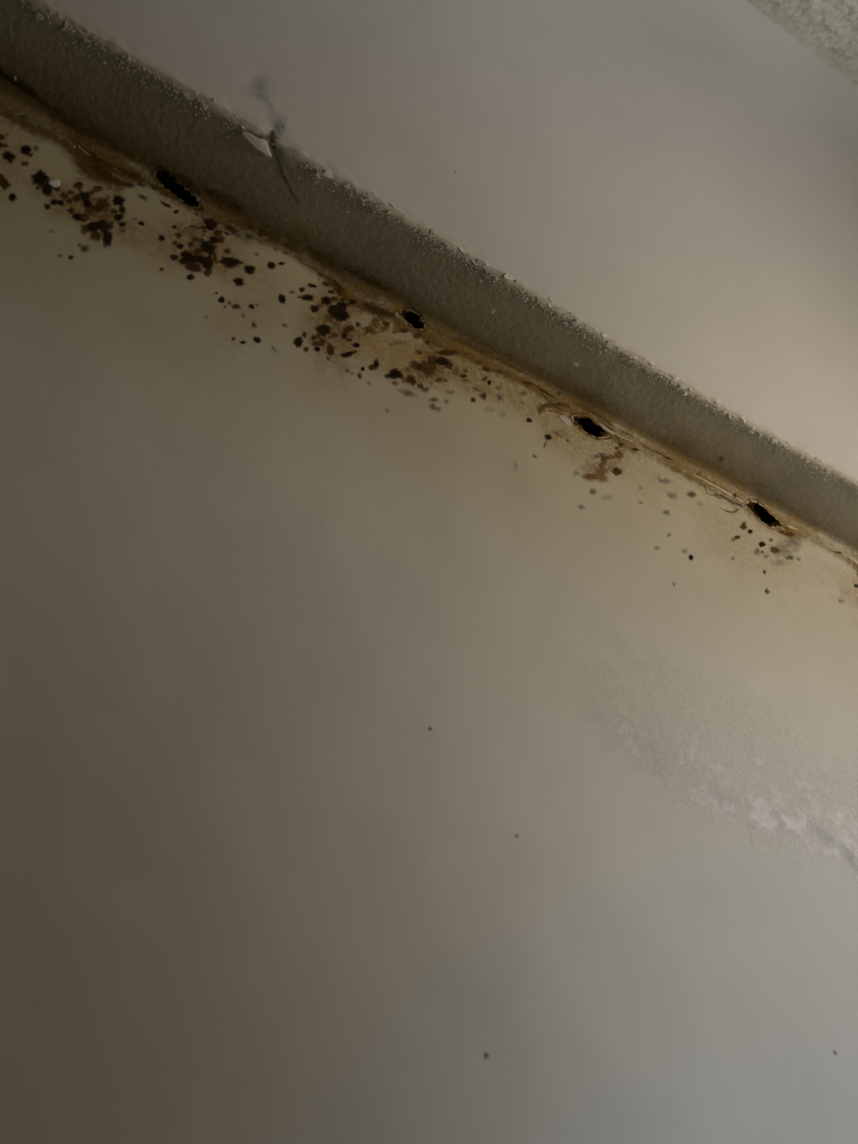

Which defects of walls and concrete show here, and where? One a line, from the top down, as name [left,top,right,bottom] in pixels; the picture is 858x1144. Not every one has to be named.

damp [0,134,144,260]
crack [241,131,298,203]
damp [138,183,285,286]
damp [215,292,261,344]
damp [279,273,499,409]
damp [583,443,638,493]
damp [732,522,799,560]